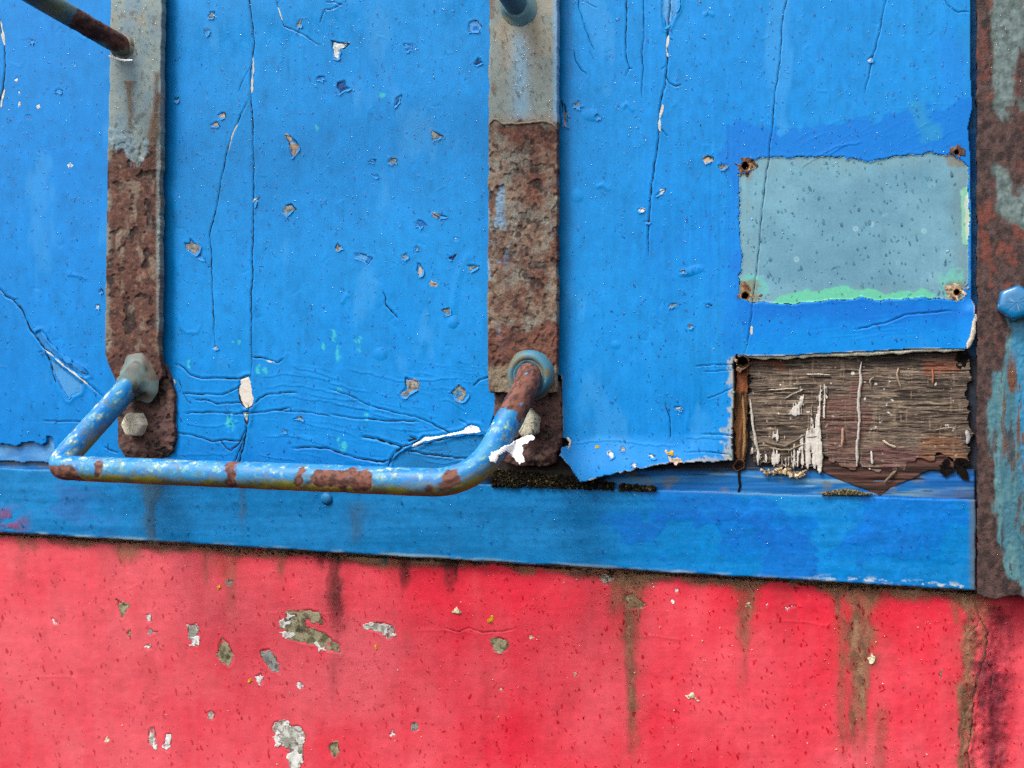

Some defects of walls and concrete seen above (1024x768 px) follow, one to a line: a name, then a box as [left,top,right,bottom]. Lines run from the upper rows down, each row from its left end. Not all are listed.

crack [625,0,680,251]
crack [175,0,473,466]
peeling [701,152,970,305]
crack [0,289,104,397]
peeling [238,377,254,424]
peeling [747,314,977,474]
peeling [279,609,342,655]
peeling [362,621,396,639]
leakage [821,582,845,619]
peeling [148,727,172,750]
peeling [273,719,306,768]
leakage [957,685,965,768]